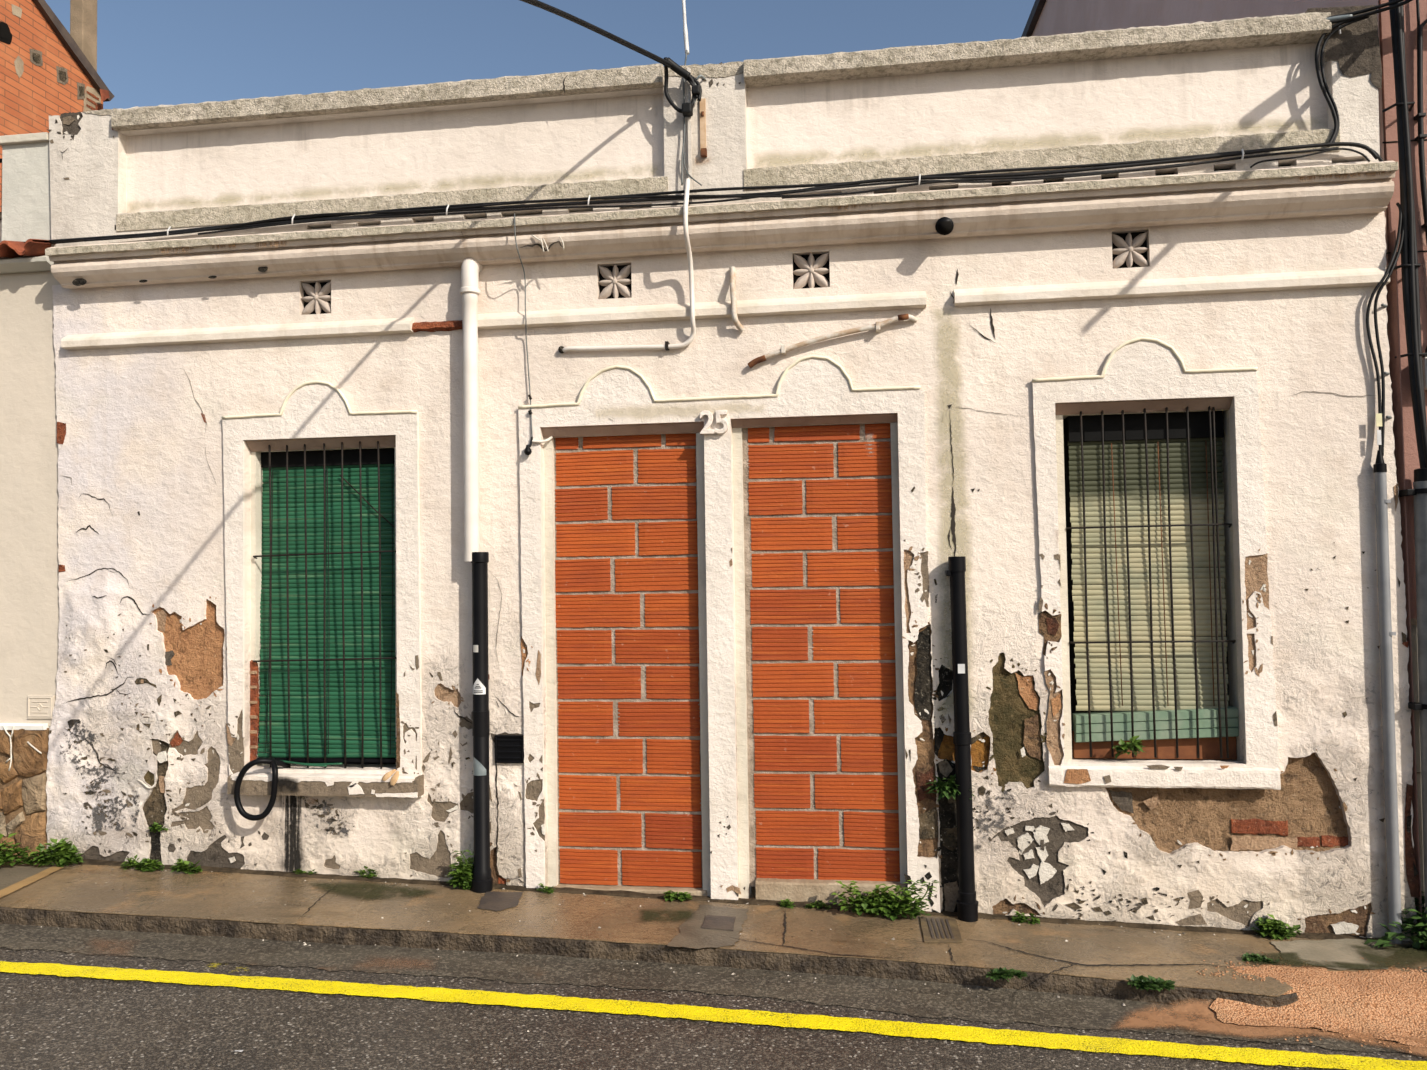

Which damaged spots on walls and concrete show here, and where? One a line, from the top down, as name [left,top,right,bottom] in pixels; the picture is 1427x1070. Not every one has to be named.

crack [61,475,110,533]
crack [68,568,150,615]
spalling [95,596,269,868]
spalling [902,540,1357,927]
peeling [396,655,473,878]
peeling [80,843,129,861]
peeling [1297,900,1375,937]